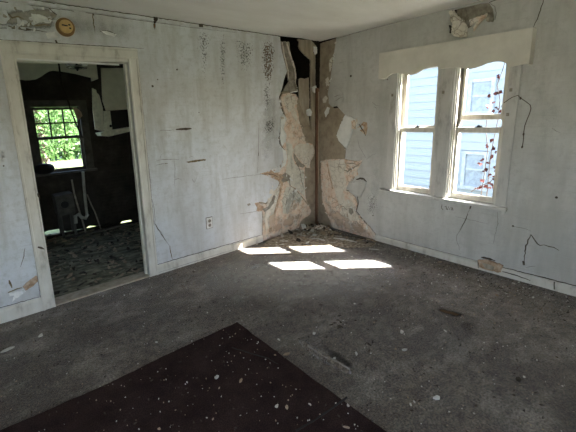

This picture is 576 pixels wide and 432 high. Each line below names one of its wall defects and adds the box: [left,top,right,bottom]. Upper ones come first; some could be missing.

peeling [0,1,58,43]
flaking render [449,0,497,38]
mould [262,41,275,109]
flaking render [247,38,376,245]
crack [514,226,558,268]
peeling [8,276,38,302]
peeling [478,257,530,281]